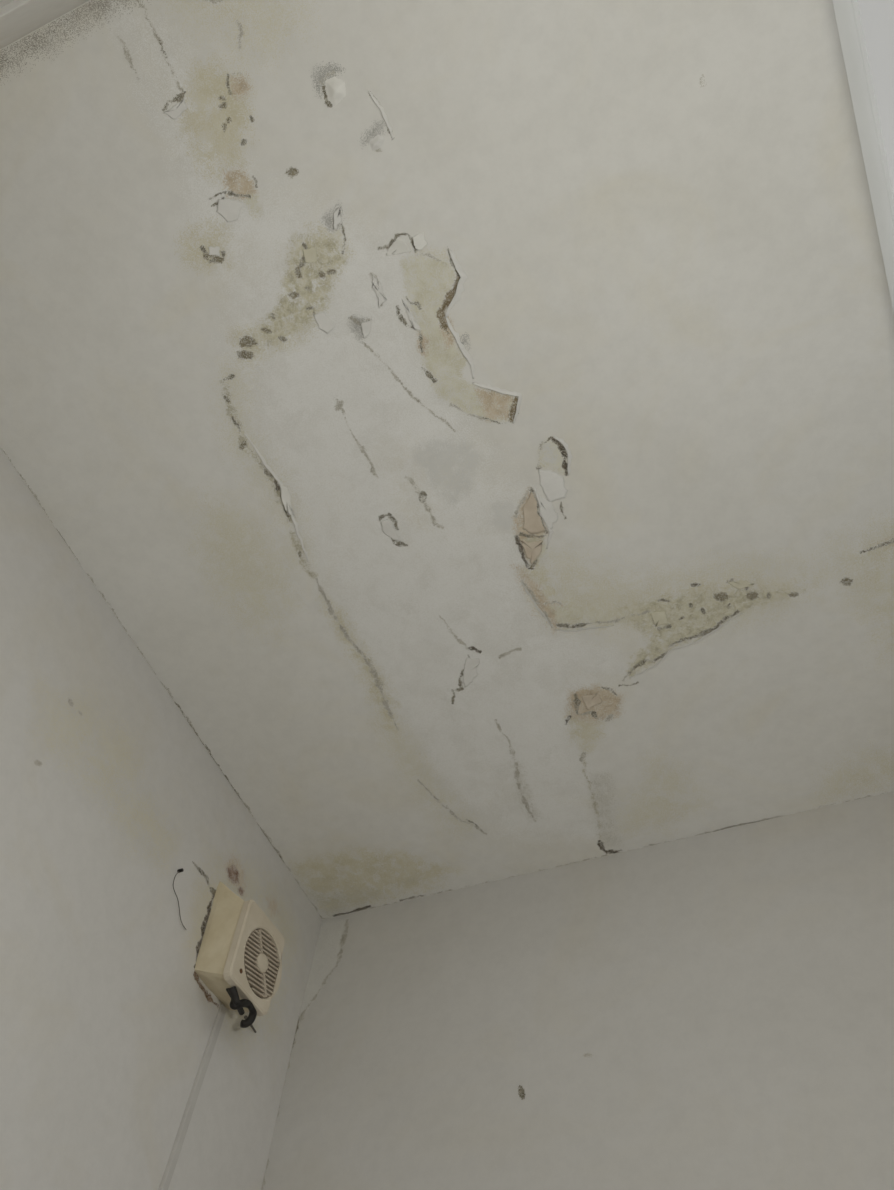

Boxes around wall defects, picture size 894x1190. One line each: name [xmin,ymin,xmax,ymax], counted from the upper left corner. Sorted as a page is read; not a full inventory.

crack [220,374,397,728]
crack [335,399,444,529]
crack [362,342,456,432]
peeling [377,232,522,424]
peeling [490,435,573,570]
crack [860,536,894,554]
crack [1,448,785,919]
peeling [561,579,808,761]